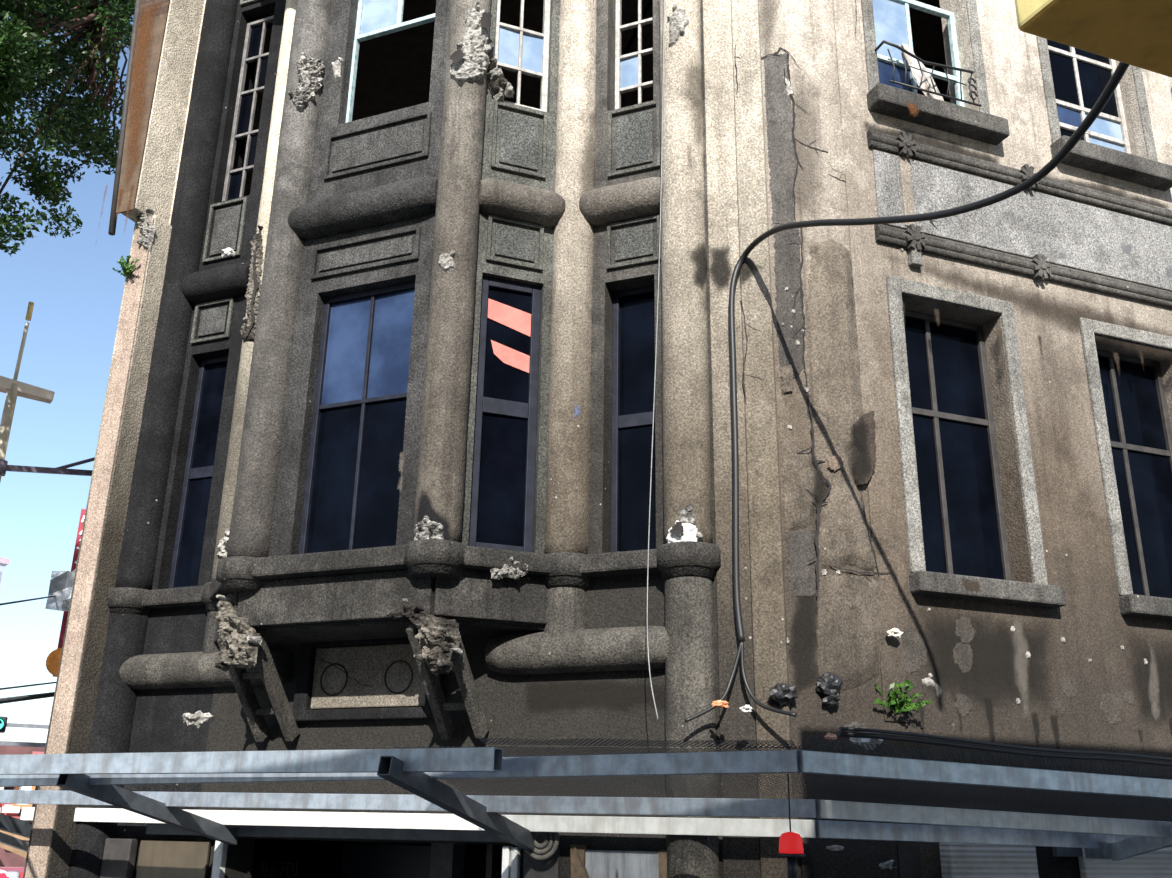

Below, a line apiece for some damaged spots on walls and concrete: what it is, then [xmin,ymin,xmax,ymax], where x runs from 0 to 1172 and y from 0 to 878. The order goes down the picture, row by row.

spalling [288,52,343,111]
spalling [450,0,515,103]
spalling [667,5,689,47]
spalling [240,225,264,342]
crack [735,45,892,596]
leakage [851,423,871,482]
spalling [666,504,703,543]
spalling [490,557,529,579]
spalling [214,595,262,672]
spalling [386,598,463,676]